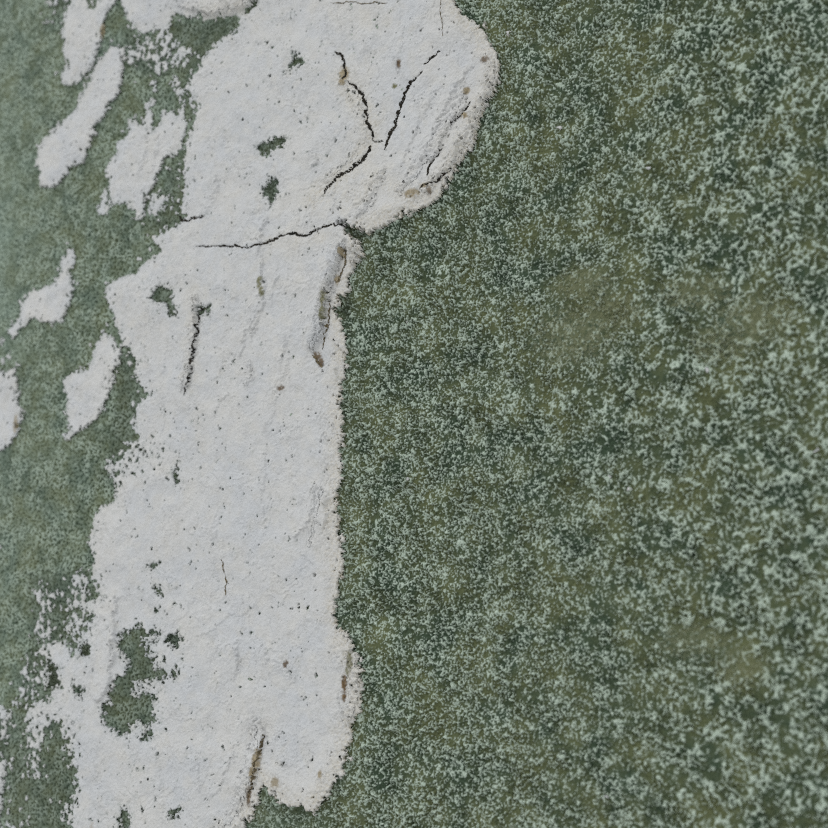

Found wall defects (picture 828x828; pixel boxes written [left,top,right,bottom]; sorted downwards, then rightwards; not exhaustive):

flaking render [40,0,72,27]
flaking render [118,0,258,237]
crack [324,0,443,194]
peeling [7,248,77,340]
flaking render [150,286,178,317]
crack [195,223,350,367]
peeling [0,351,26,451]
flaking render [96,342,153,487]
flaking render [0,566,100,828]
flaking render [102,622,184,741]
flaking render [118,810,132,828]